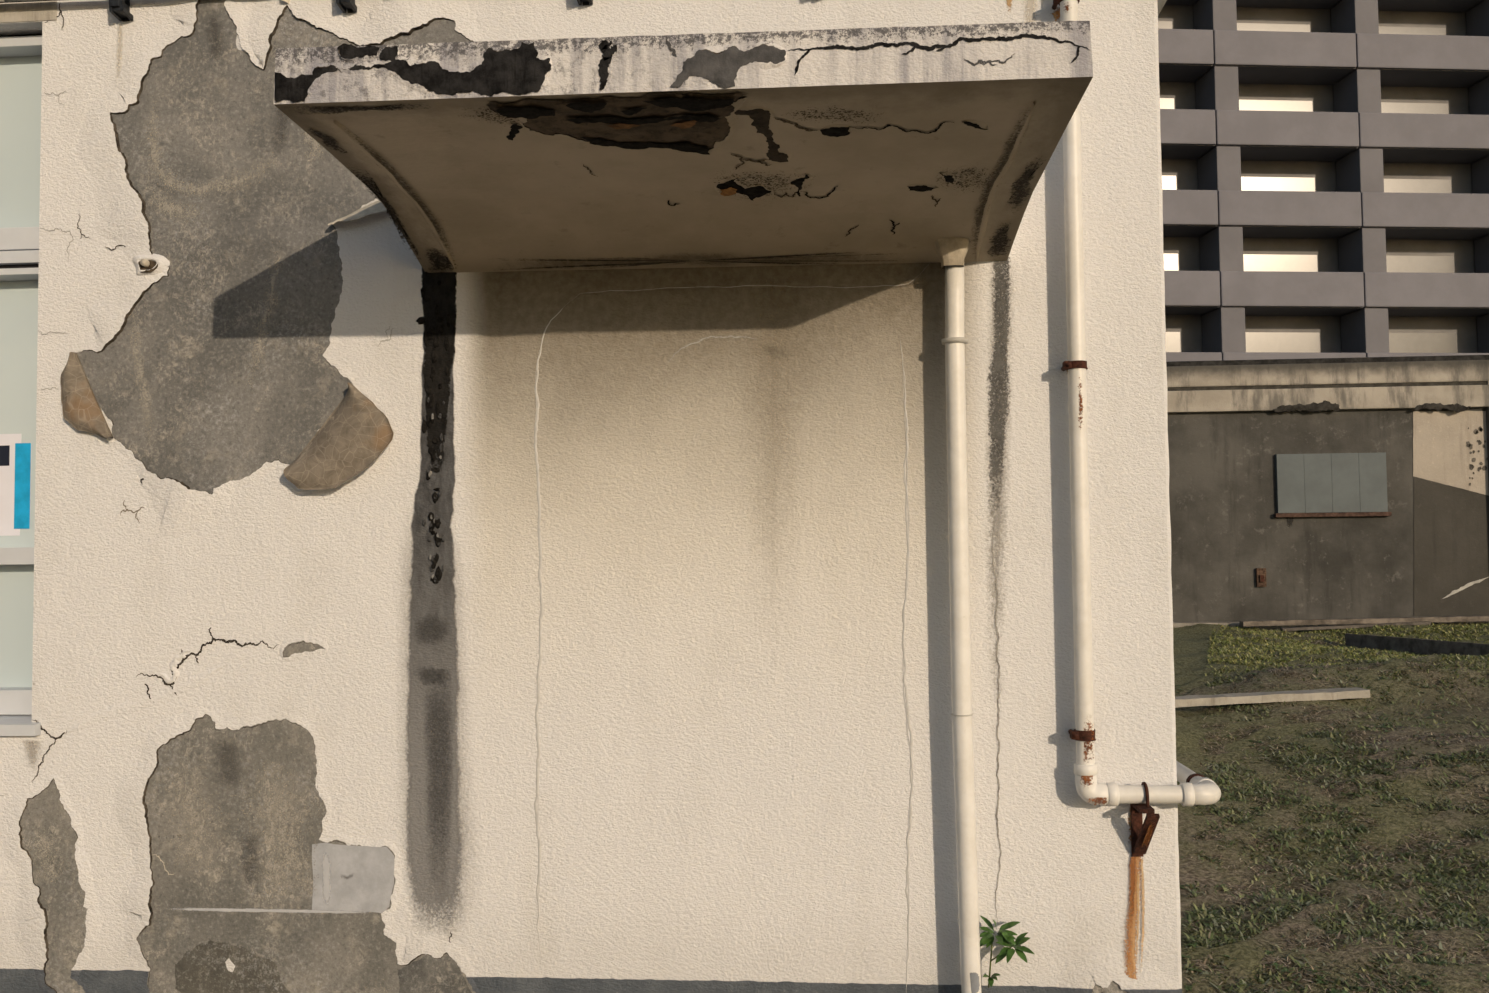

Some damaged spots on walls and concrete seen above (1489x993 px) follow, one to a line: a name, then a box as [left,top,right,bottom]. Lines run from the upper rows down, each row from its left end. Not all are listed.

leakage [297,104,421,153]
crack [788,33,1089,74]
peeling [60,0,988,539]
crack [136,628,276,699]
leakage [353,169,461,918]
crack [534,262,931,988]
peeling [0,774,102,993]
peeling [115,707,481,993]
peeling [1055,945,1179,993]
corrosion [1124,811,1154,980]